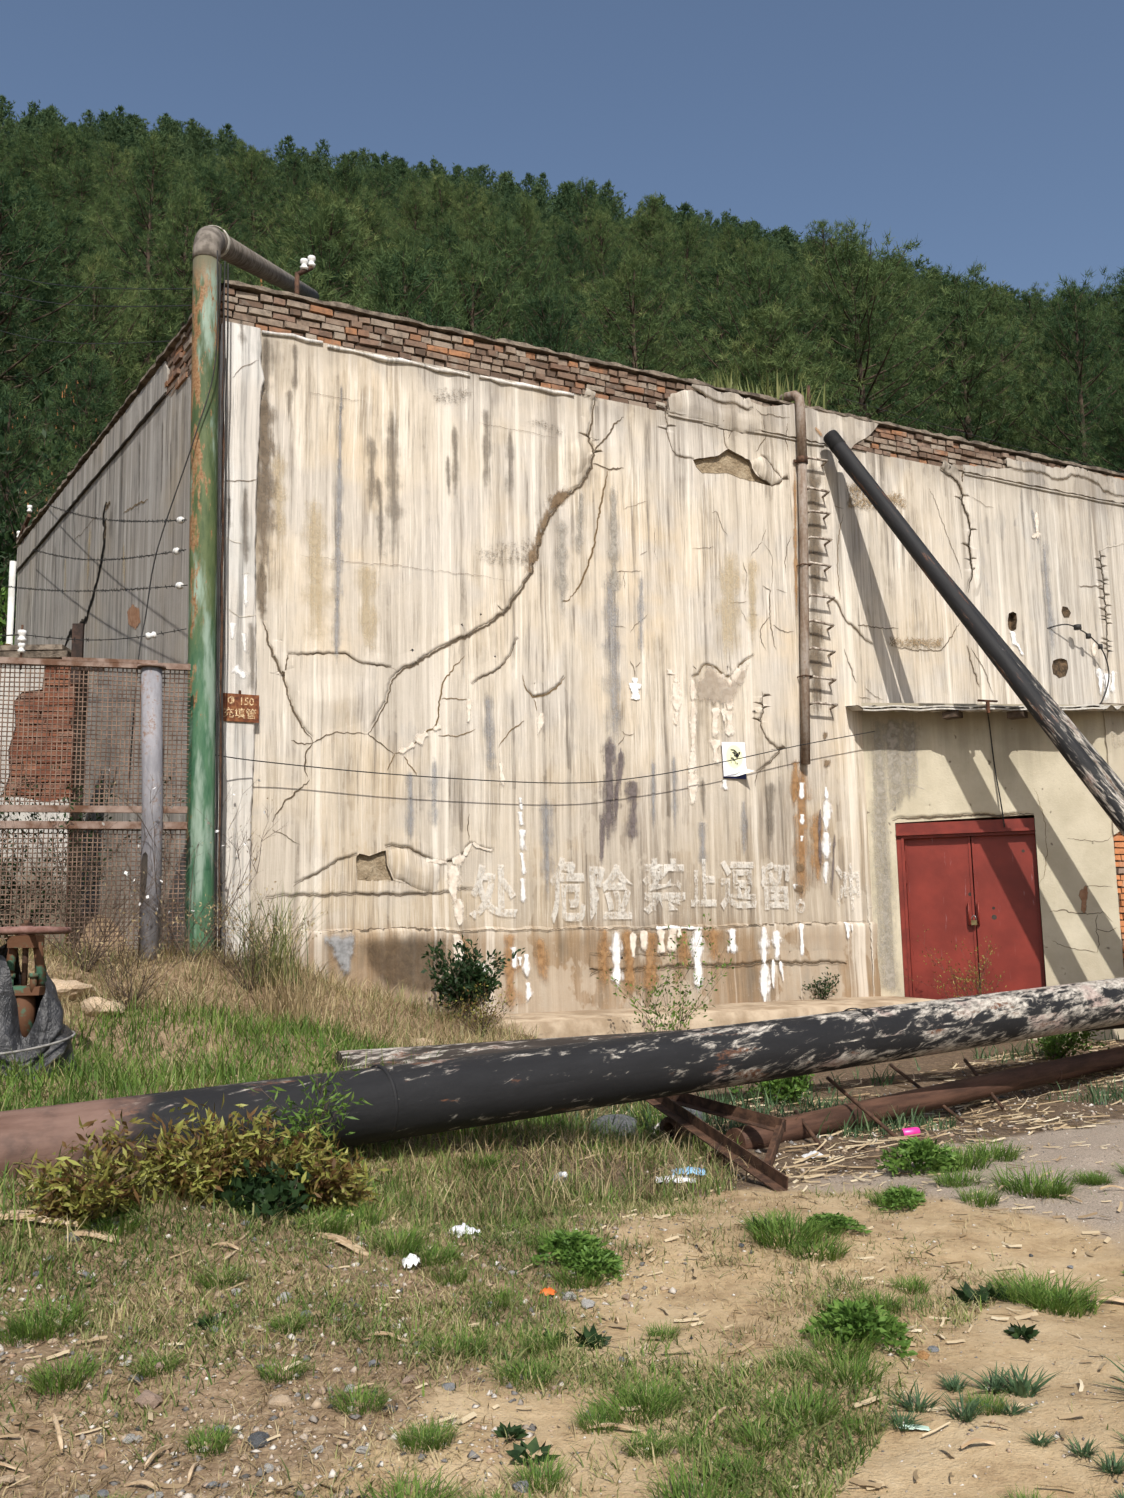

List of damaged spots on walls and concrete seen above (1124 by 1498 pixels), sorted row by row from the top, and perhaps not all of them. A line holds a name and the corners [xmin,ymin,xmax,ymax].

water stain [228,339,296,682]
flaking render [693,449,771,486]
crack [1006,458,1124,497]
crack [39,499,148,646]
crack [823,460,994,699]
crack [1080,550,1114,671]
crack [223,378,875,991]
water stain [600,493,655,859]
flaking render [356,850,422,895]
water stain [799,782,836,887]
water stain [610,925,704,986]
water stain [760,927,784,1002]